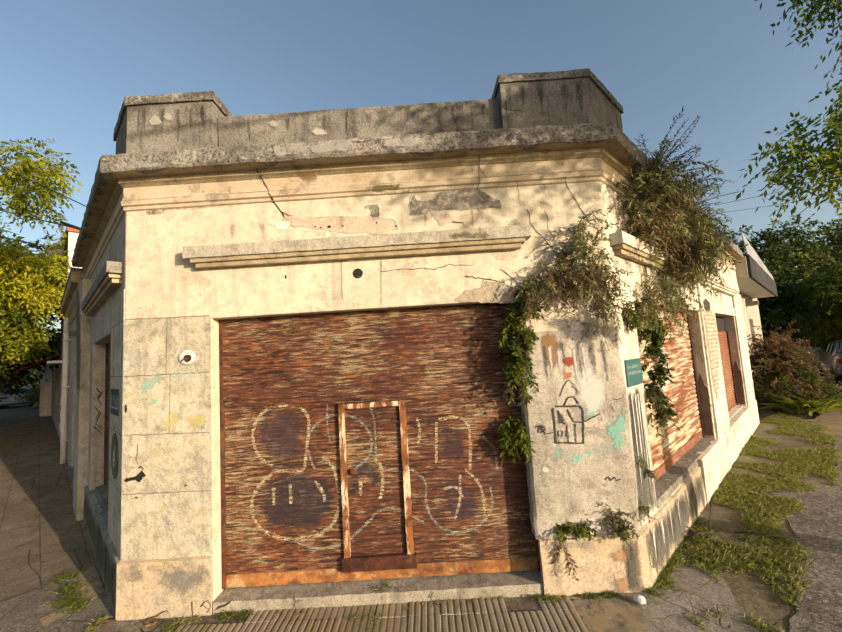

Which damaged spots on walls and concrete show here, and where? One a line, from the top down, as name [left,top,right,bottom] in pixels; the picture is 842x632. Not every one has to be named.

crack [256,168,292,218]
flaking render [251,203,400,235]
spalling [408,188,503,227]
leakage [627,389,657,523]
leakage [625,473,705,590]